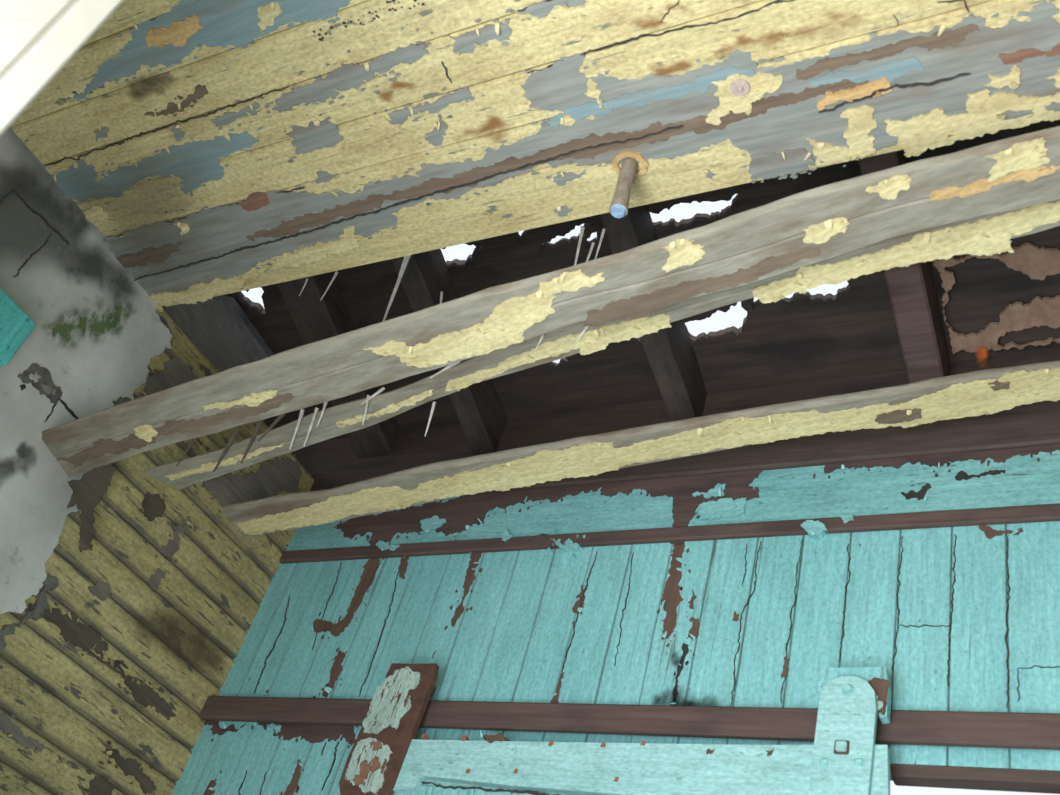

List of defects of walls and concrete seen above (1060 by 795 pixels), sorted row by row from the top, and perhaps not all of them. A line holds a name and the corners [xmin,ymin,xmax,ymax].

peeling [48,0,1060,312]
leakage [0,171,133,323]
spalling [17,363,63,404]
peeling [112,347,199,405]
rust [977,347,987,361]
peeling [875,408,922,424]
leakage [0,444,34,478]
peeling [201,454,302,507]
peeling [813,445,1060,501]
peeling [310,470,763,704]
peeling [0,574,176,720]
peeling [203,666,421,795]